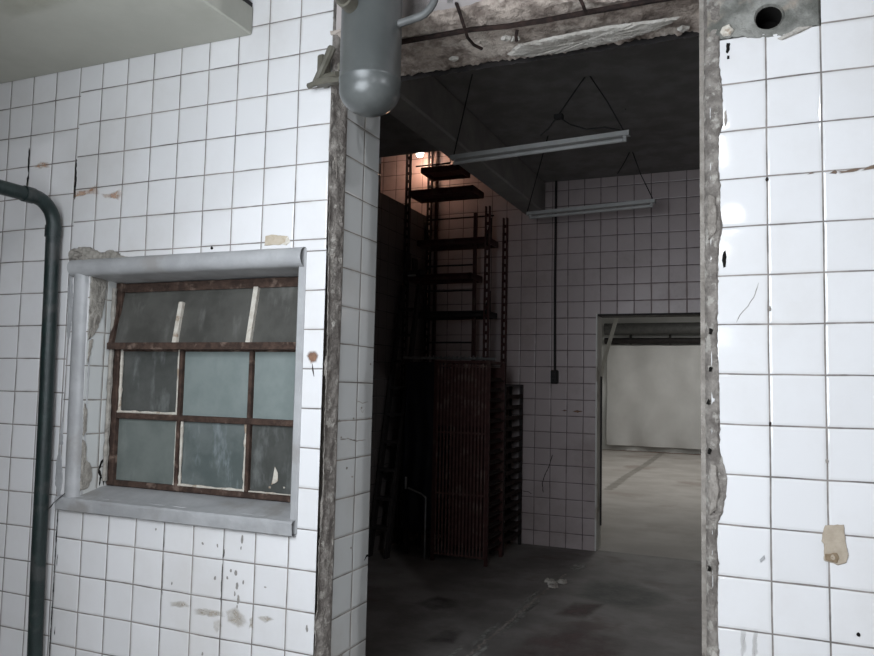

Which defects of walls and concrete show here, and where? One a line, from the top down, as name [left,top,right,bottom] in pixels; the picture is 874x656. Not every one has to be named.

spalling [330,0,341,73]
crack [24,149,32,186]
crack [71,159,79,200]
spalling [68,247,126,260]
spalling [87,277,107,363]
spalling [314,85,353,656]
spalling [401,0,821,656]
spalling [80,404,92,491]